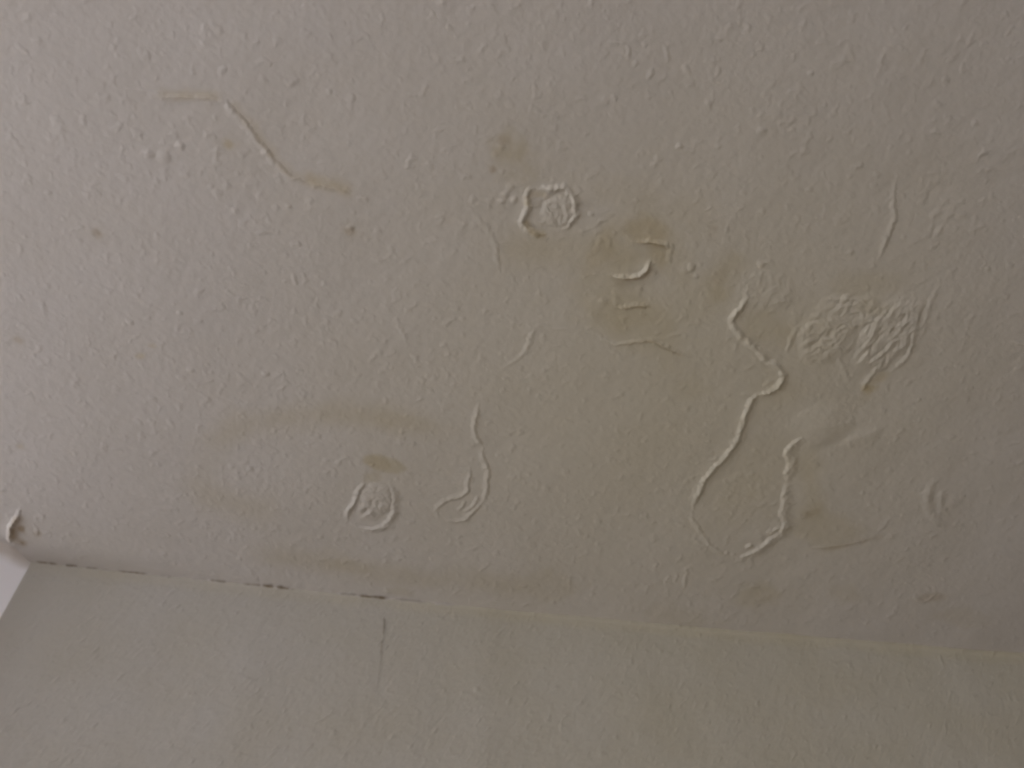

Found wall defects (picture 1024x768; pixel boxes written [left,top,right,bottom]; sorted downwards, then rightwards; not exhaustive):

peeling [511,179,584,242]
peeling [606,258,652,279]
peeling [681,269,813,567]
peeling [431,400,492,524]
peeling [0,506,40,550]
crack [32,560,291,590]